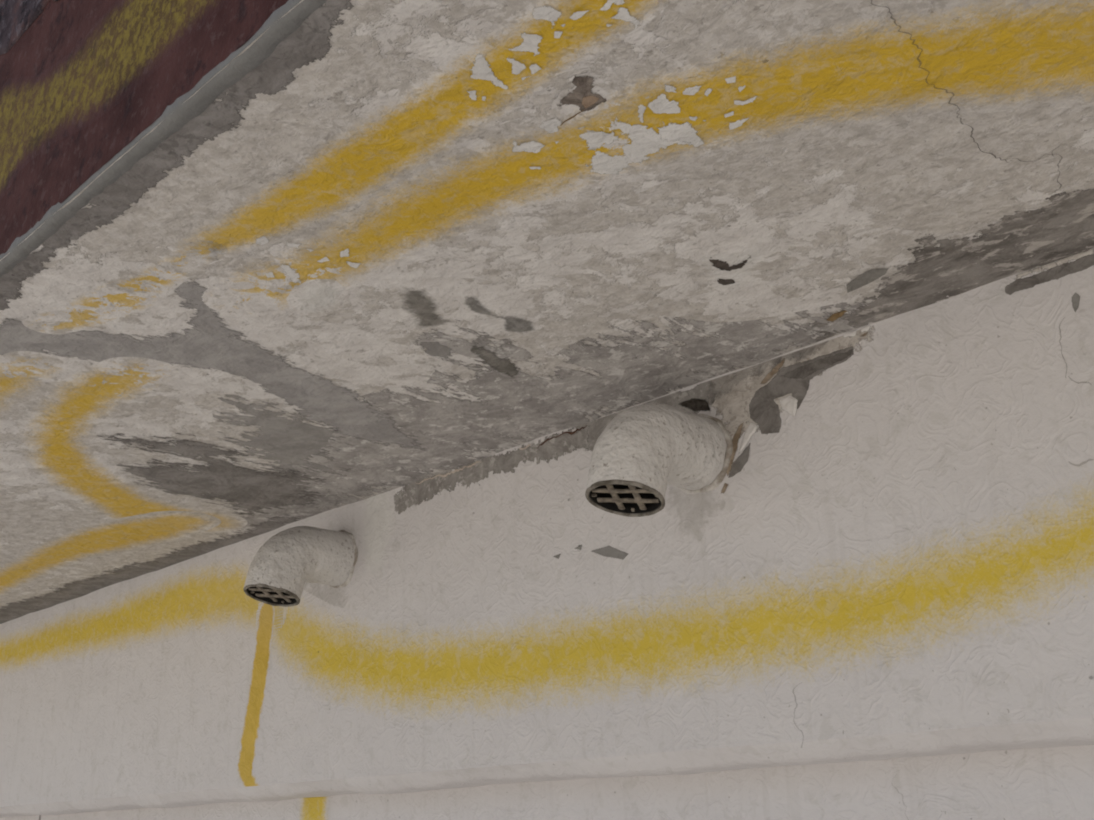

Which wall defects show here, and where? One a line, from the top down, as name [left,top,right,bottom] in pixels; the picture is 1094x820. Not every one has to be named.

crack [965,124,1009,163]
peeling [0,0,1094,538]
water stain [398,286,455,329]
water stain [461,294,536,333]
water stain [421,342,451,358]
water stain [471,346,519,377]